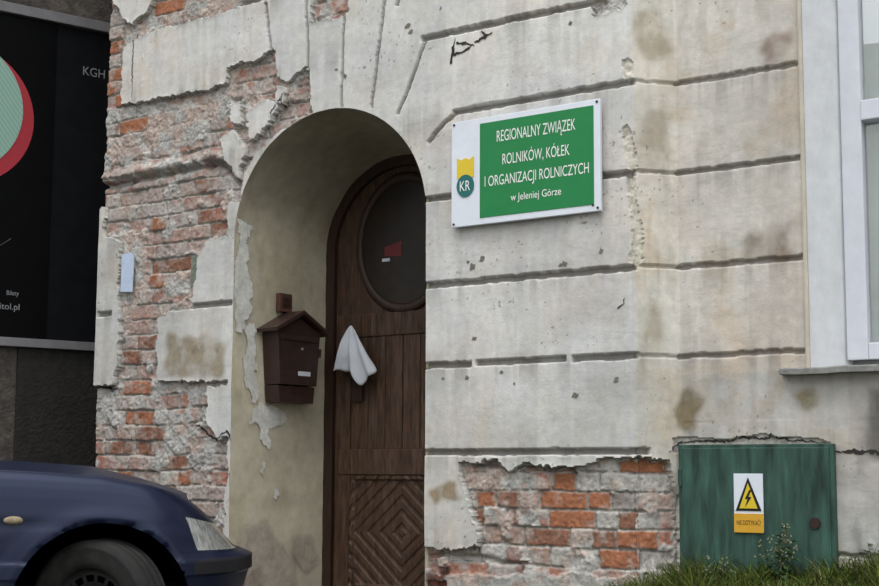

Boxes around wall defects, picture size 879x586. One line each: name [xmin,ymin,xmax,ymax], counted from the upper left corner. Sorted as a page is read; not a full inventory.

flaking render [591,0,627,17]
crack [450,31,492,64]
flaking render [94,0,313,533]
leakage [676,390,702,429]
crack [669,433,879,455]
flaking render [425,433,831,586]